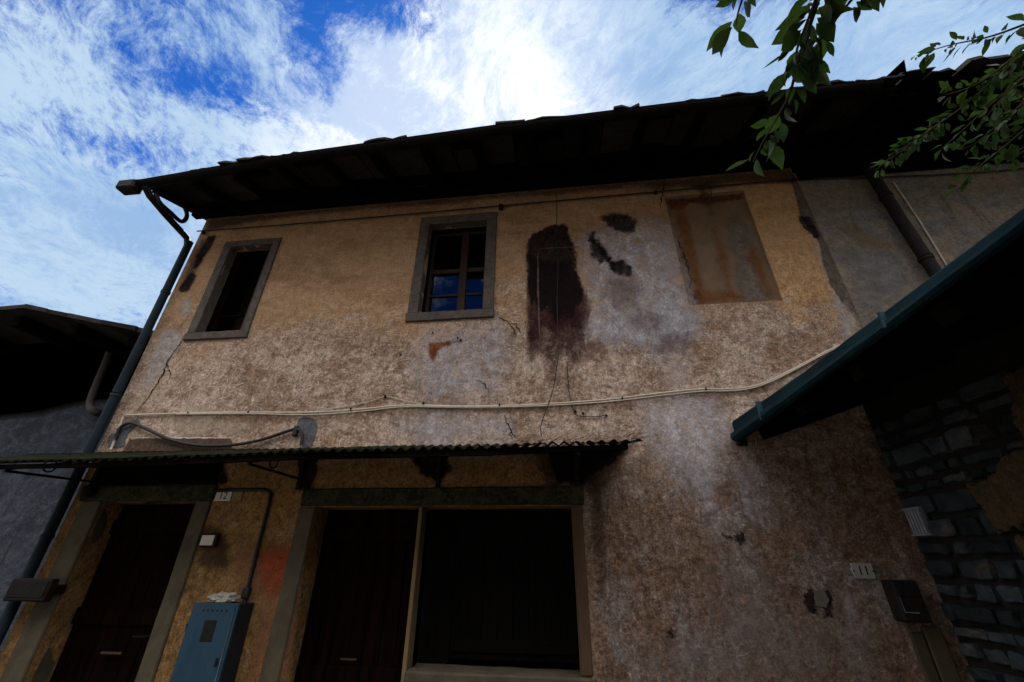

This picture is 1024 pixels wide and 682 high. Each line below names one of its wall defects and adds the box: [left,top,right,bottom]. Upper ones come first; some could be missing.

water stain [179,205,390,292]
water stain [526,223,694,362]
crack [137,342,181,411]
flaking render [803,588,833,619]